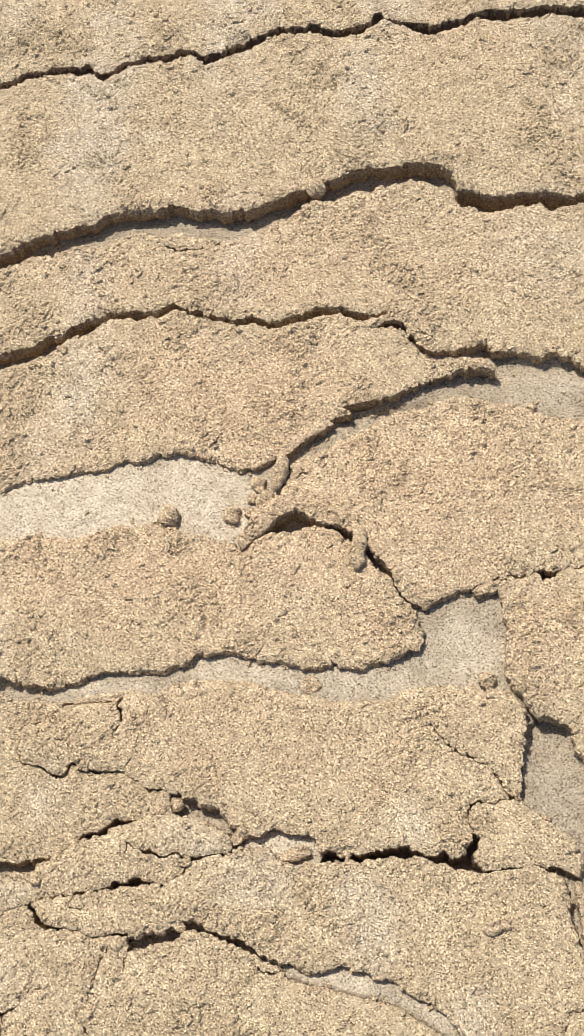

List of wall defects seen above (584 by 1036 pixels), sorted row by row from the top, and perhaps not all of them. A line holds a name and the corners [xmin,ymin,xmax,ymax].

crack [0,7,584,90]
crack [0,176,494,269]
crack [0,316,584,554]
crack [0,533,584,1036]